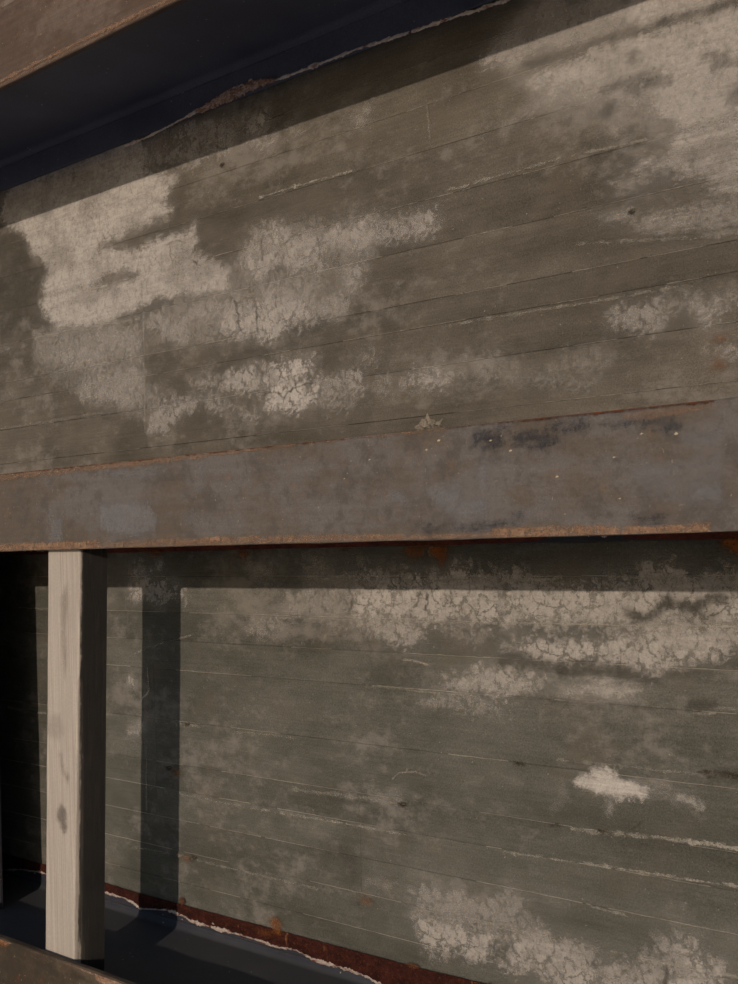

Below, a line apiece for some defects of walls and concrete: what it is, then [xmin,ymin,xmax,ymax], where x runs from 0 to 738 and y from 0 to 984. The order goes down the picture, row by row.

peeling [226,0,510,100]
corrosion [195,78,276,113]
leakage [485,0,738,192]
efflorescence [0,120,232,363]
efflorescence [222,357,364,416]
corrosion [0,522,738,556]
leakage [351,559,738,698]
efflorescence [574,766,648,801]
corrosion [2,853,46,874]
corrosion [105,883,491,984]
efflorescence [413,915,498,962]
efflorescence [499,929,725,984]